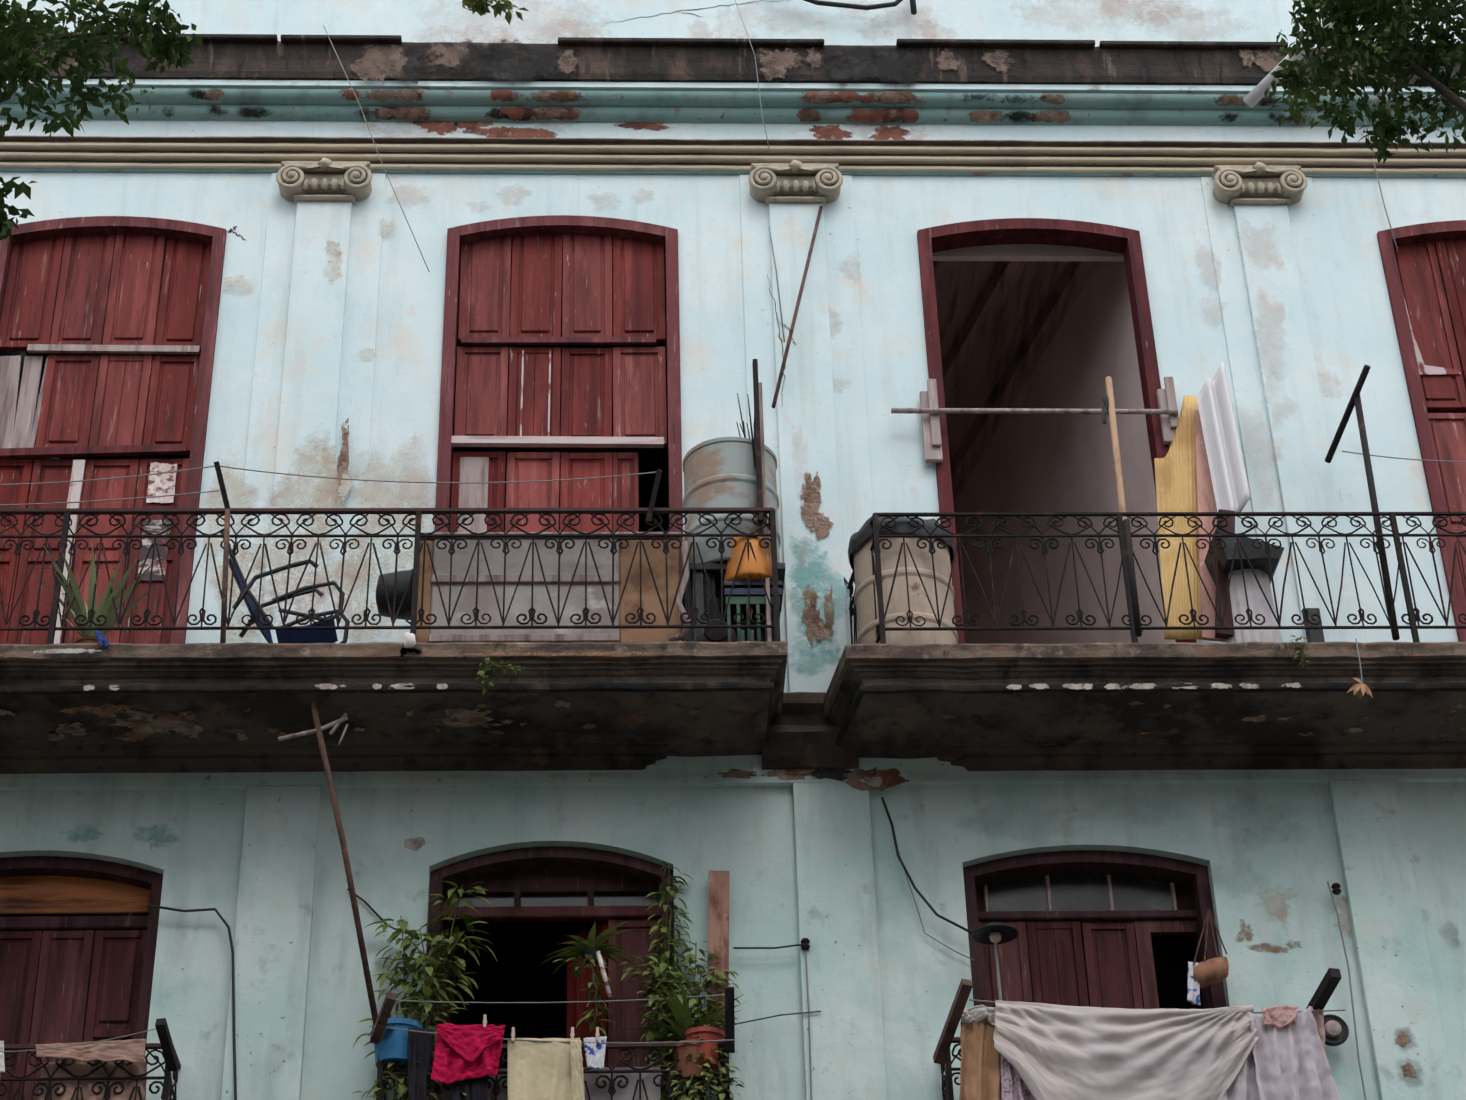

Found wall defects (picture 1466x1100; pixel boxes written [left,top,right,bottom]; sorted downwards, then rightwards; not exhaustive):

spalling [936,48,960,70]
spalling [982,51,1014,72]
peeling [339,42,583,138]
peeling [615,123,669,131]
peeling [797,91,920,140]
spalling [800,471,834,540]
spalling [801,584,835,647]